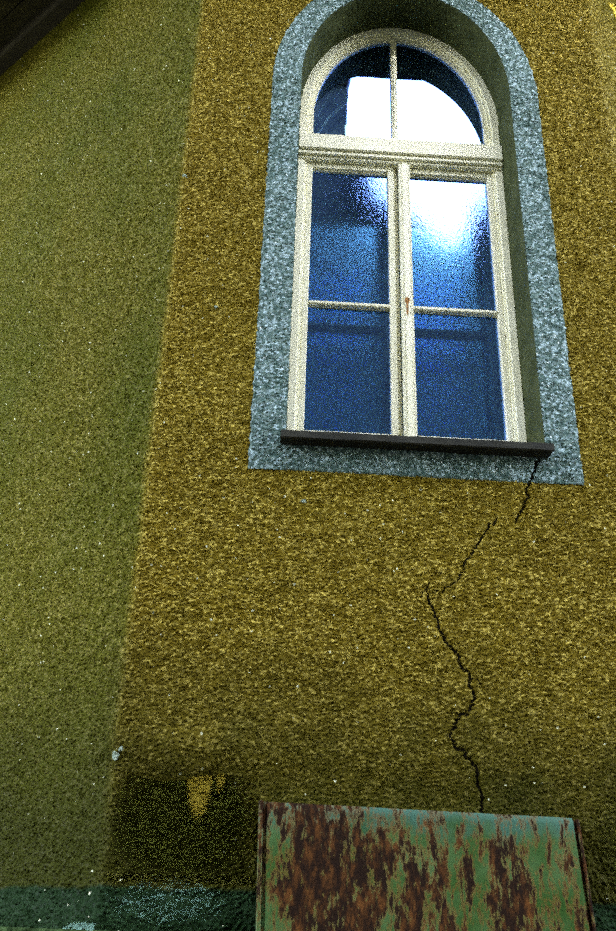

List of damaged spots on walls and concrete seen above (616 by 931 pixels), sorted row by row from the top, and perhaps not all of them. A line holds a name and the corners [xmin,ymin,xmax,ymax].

crack [421,458,540,813]